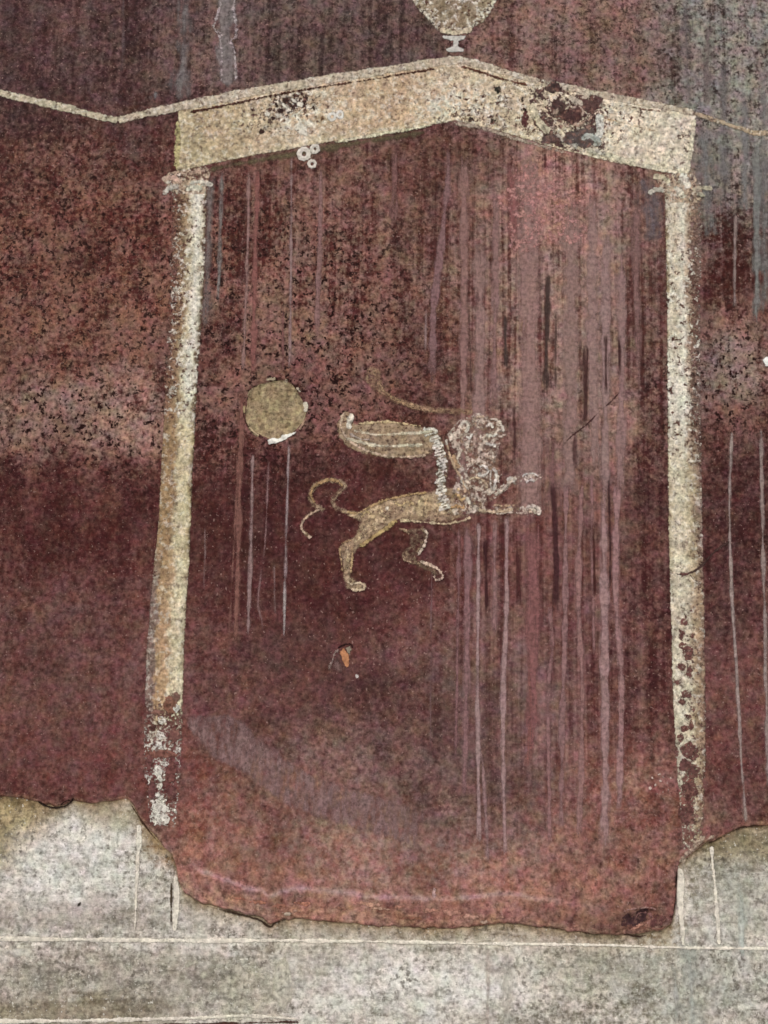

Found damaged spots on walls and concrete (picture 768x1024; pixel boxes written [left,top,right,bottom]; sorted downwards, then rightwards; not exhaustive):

peeling [521,81,617,155]
flaking render [328,643,359,678]
peeling [673,618,700,826]
flaking render [0,691,768,1024]